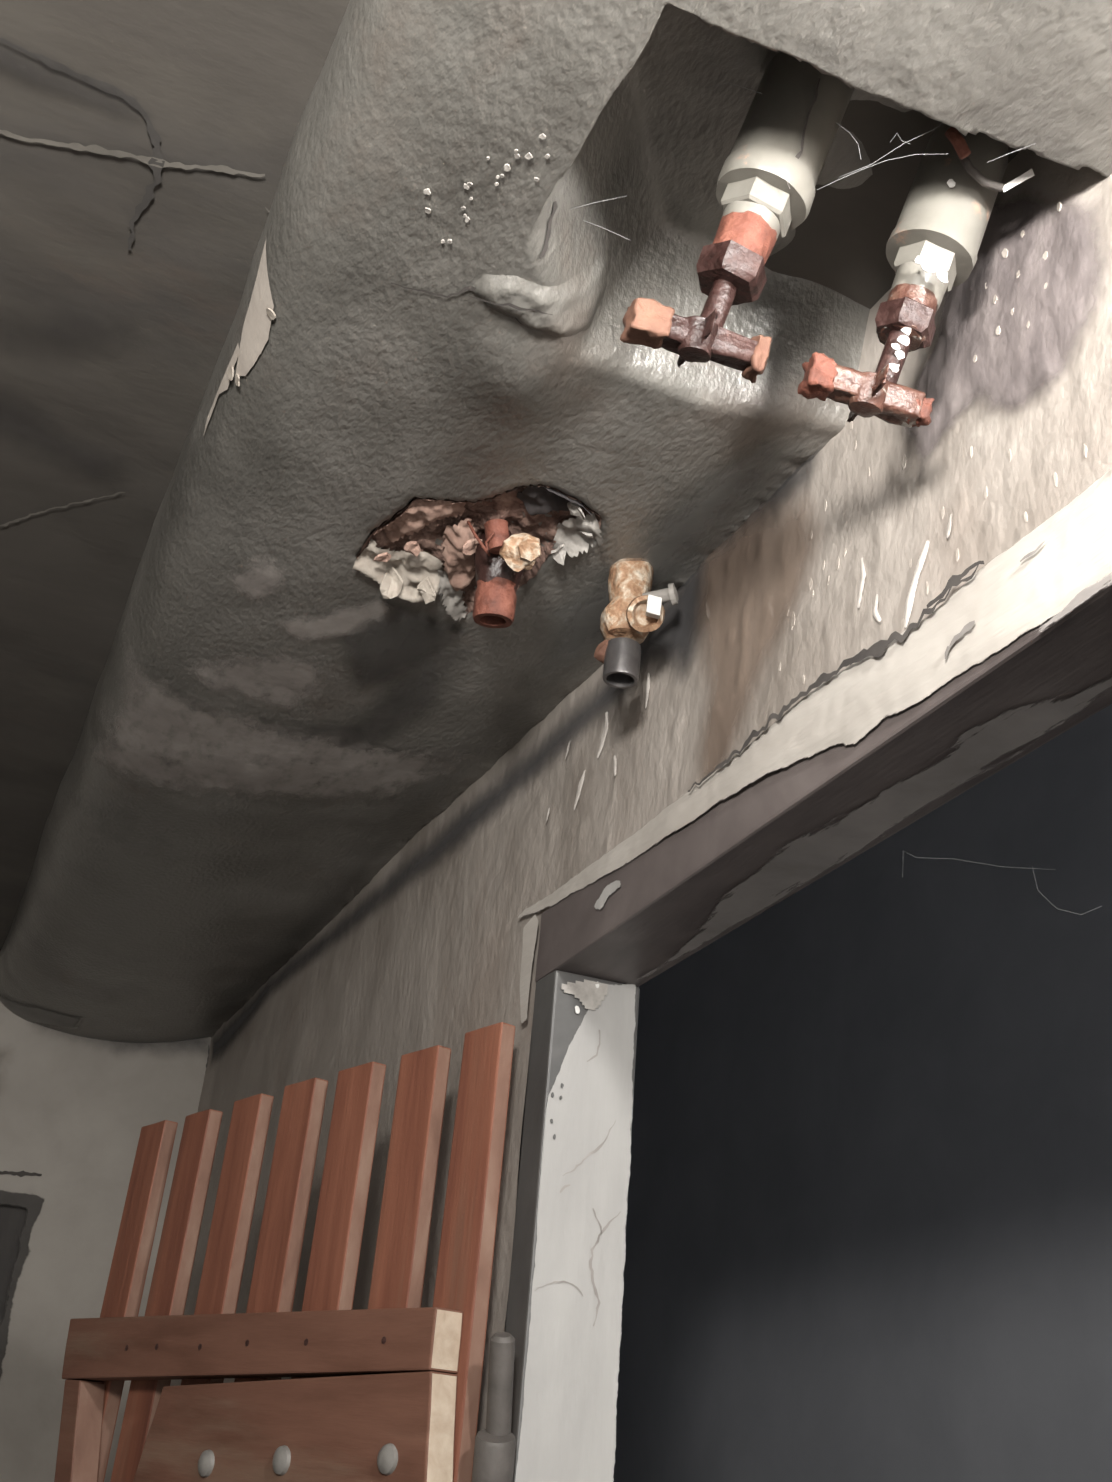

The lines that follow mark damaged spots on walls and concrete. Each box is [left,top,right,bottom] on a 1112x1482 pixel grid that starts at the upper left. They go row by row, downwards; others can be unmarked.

crack [0,130,270,212]
peeling [203,241,276,436]
flaking render [352,484,603,621]
crack [688,561,984,792]